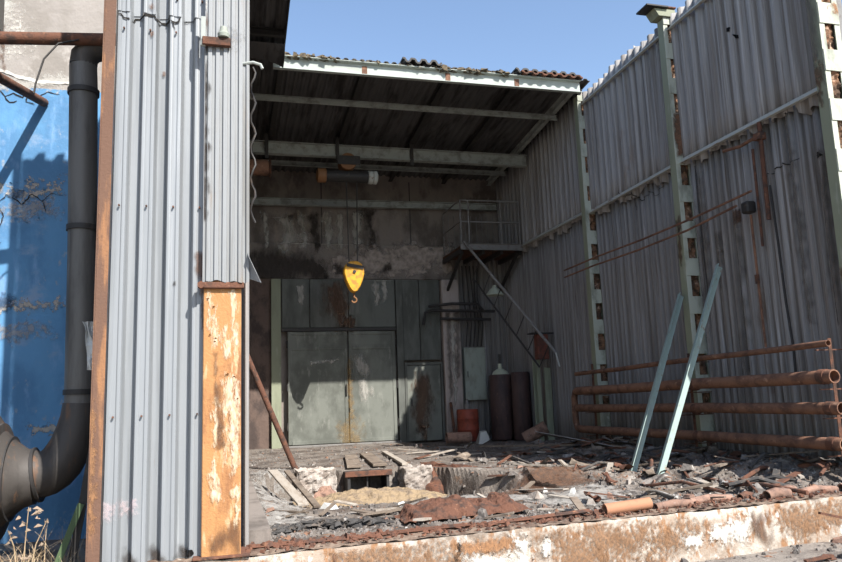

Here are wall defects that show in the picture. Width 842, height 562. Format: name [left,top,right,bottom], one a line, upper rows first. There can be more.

crack [0,193,63,243]
peeling [0,174,68,223]
damp [249,210,377,303]
peeling [0,292,66,343]
peeling [206,289,239,358]
corrosion [411,376,433,441]
corrosion [88,409,98,534]
peeling [207,373,241,525]
corrosion [325,537,515,562]
corrosion [534,517,710,562]
corrosion [753,499,842,543]